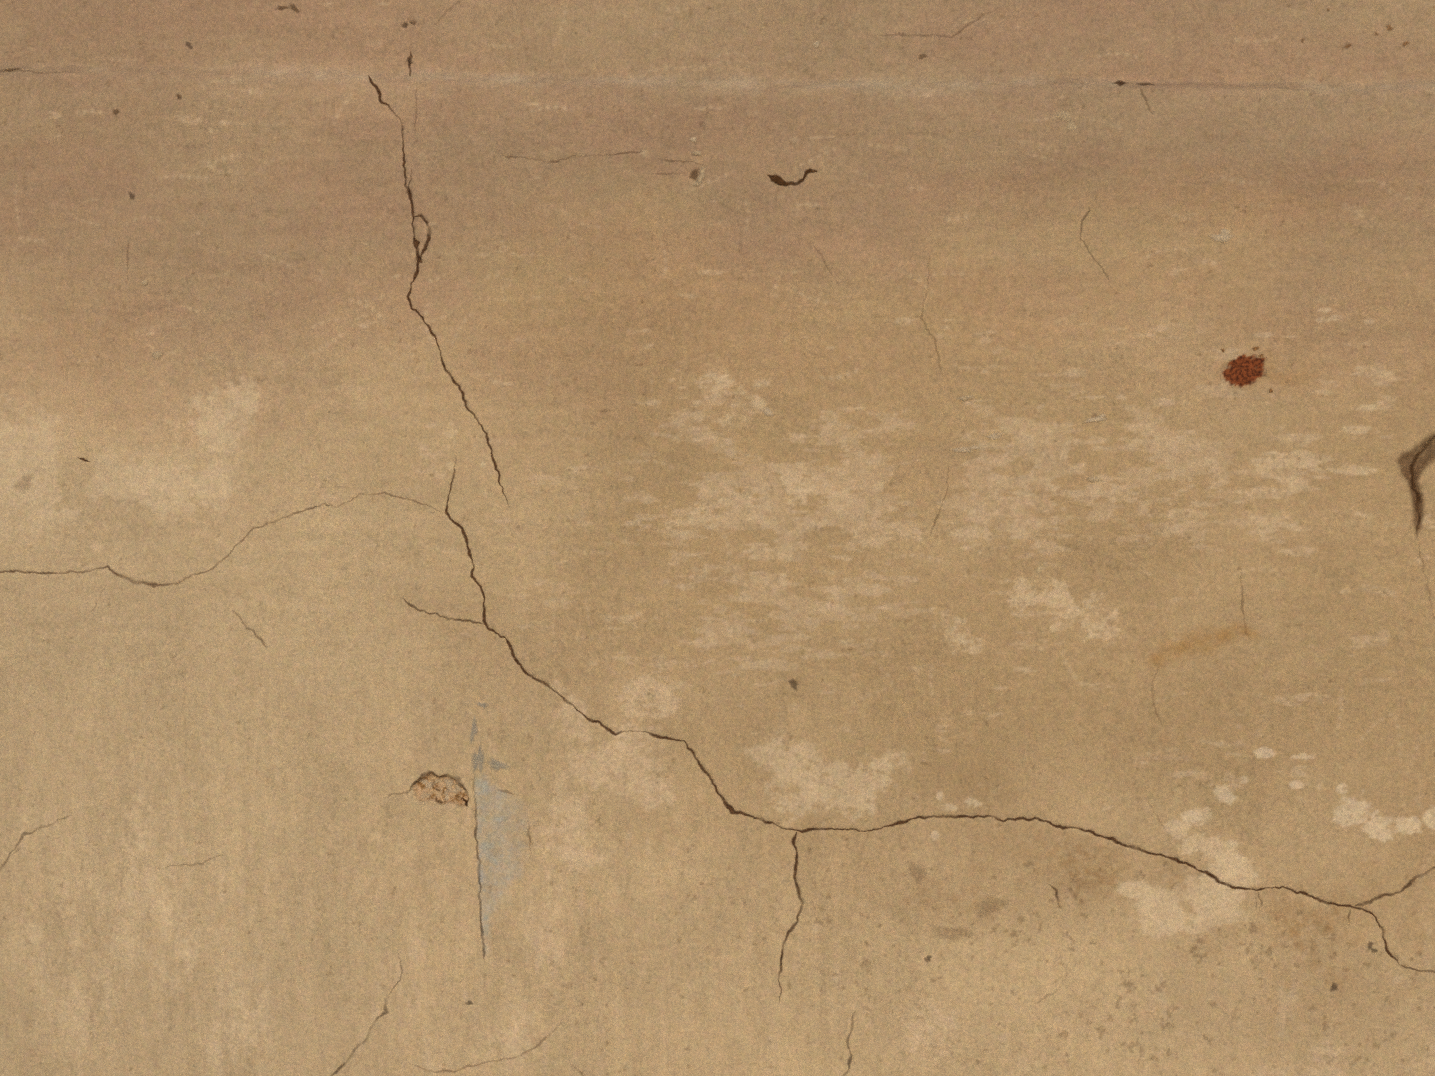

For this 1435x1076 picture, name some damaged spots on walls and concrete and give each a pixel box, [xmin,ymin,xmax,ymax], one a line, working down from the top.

crack [368,51,508,503]
crack [767,168,818,186]
corrosion [1220,347,1273,392]
peeling [411,667,987,960]
crack [407,473,1426,990]